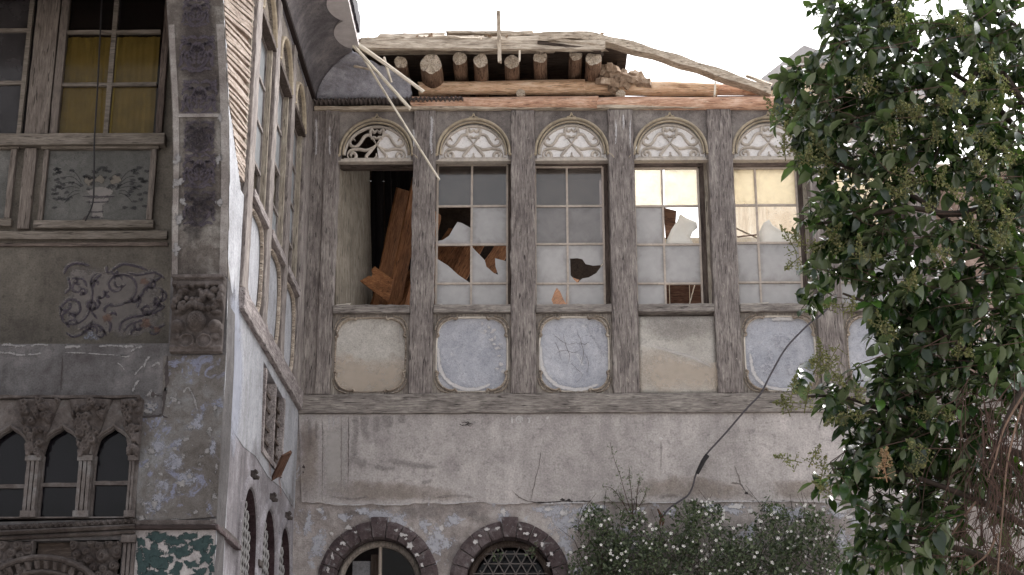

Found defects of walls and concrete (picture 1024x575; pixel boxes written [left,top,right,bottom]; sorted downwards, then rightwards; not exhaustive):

crack [539,322,608,392]
peeling [136,383,218,575]
peeling [303,497,479,573]
peeling [473,503,514,544]
peeling [520,502,607,568]